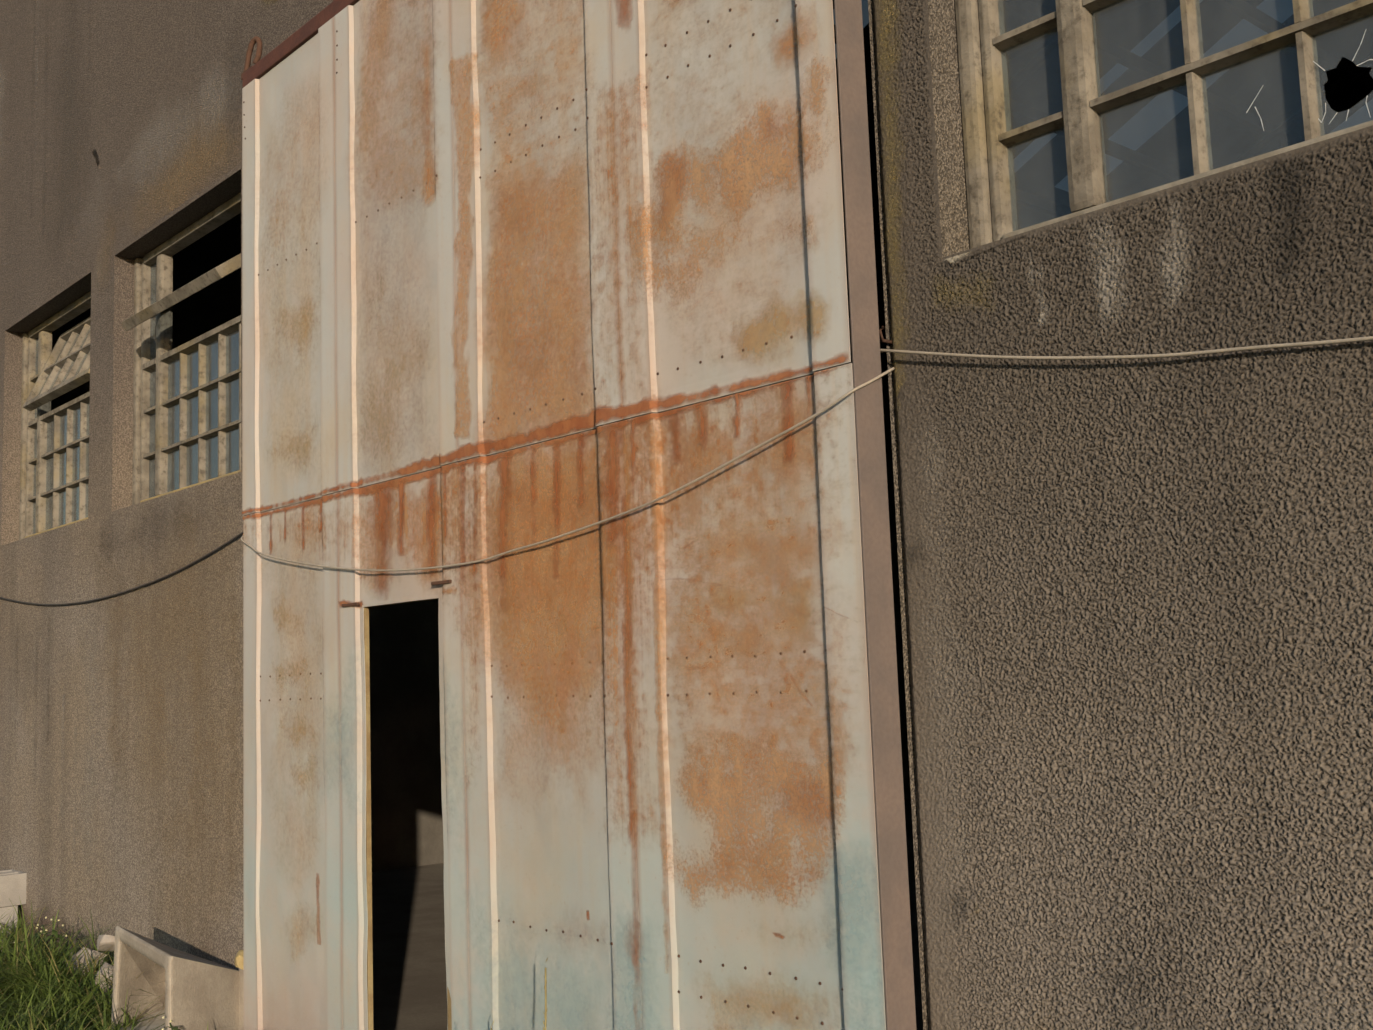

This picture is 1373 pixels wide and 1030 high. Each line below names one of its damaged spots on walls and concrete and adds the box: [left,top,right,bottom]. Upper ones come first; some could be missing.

corrosion [242,62,847,833]
corrosion [664,732,842,904]